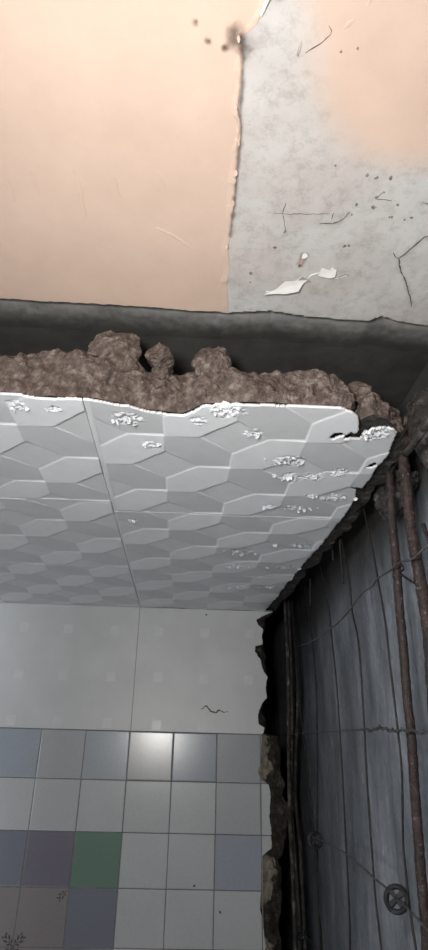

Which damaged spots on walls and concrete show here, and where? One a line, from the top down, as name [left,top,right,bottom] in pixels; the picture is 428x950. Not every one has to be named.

peeling [219,0,428,326]
crack [393,236,428,306]
spalling [255,613,273,682]
spalling [258,698,288,950]